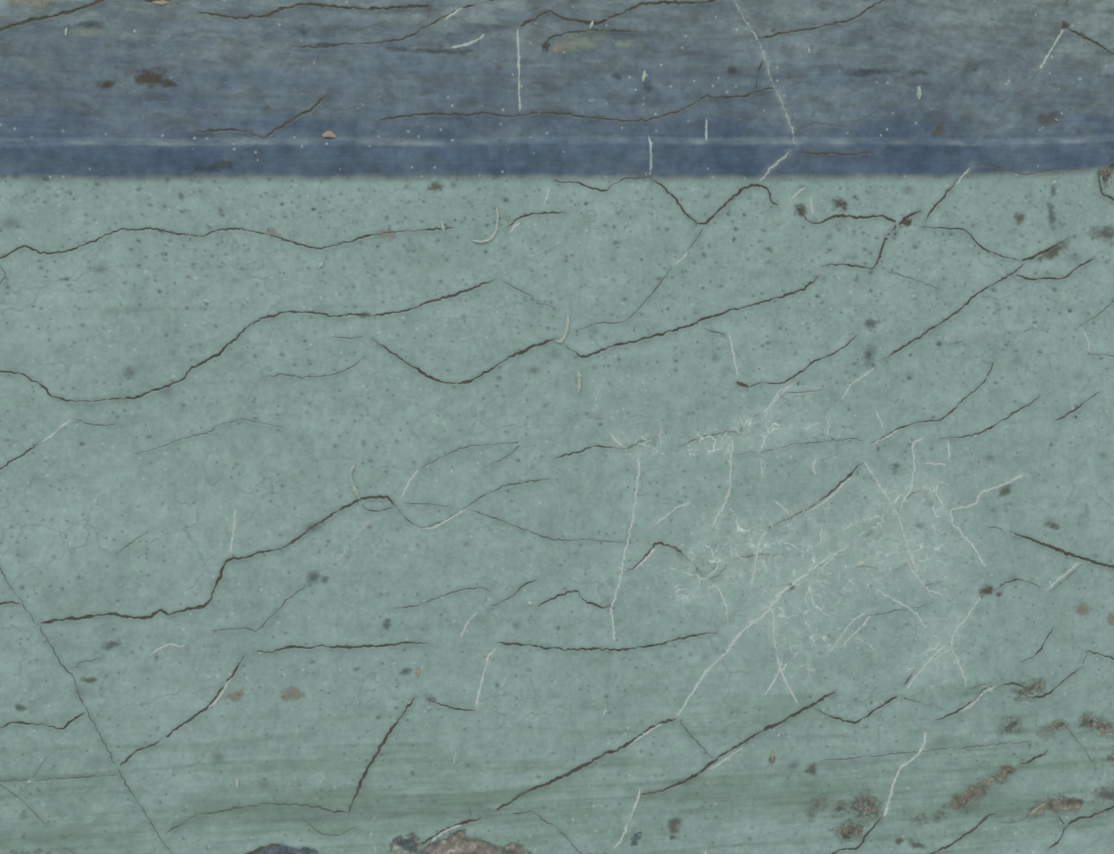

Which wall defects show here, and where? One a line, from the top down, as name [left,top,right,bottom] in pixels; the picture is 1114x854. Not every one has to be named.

crack [0,0,504,52]
crack [509,0,737,56]
crack [747,0,889,42]
crack [1027,0,1114,87]
crack [195,94,363,141]
crack [379,58,848,136]
crack [802,149,872,159]
crack [1095,175,1114,204]
crack [1077,298,1114,360]
crack [0,161,1096,854]
peeling [256,845,318,854]
peeling [390,831,532,854]